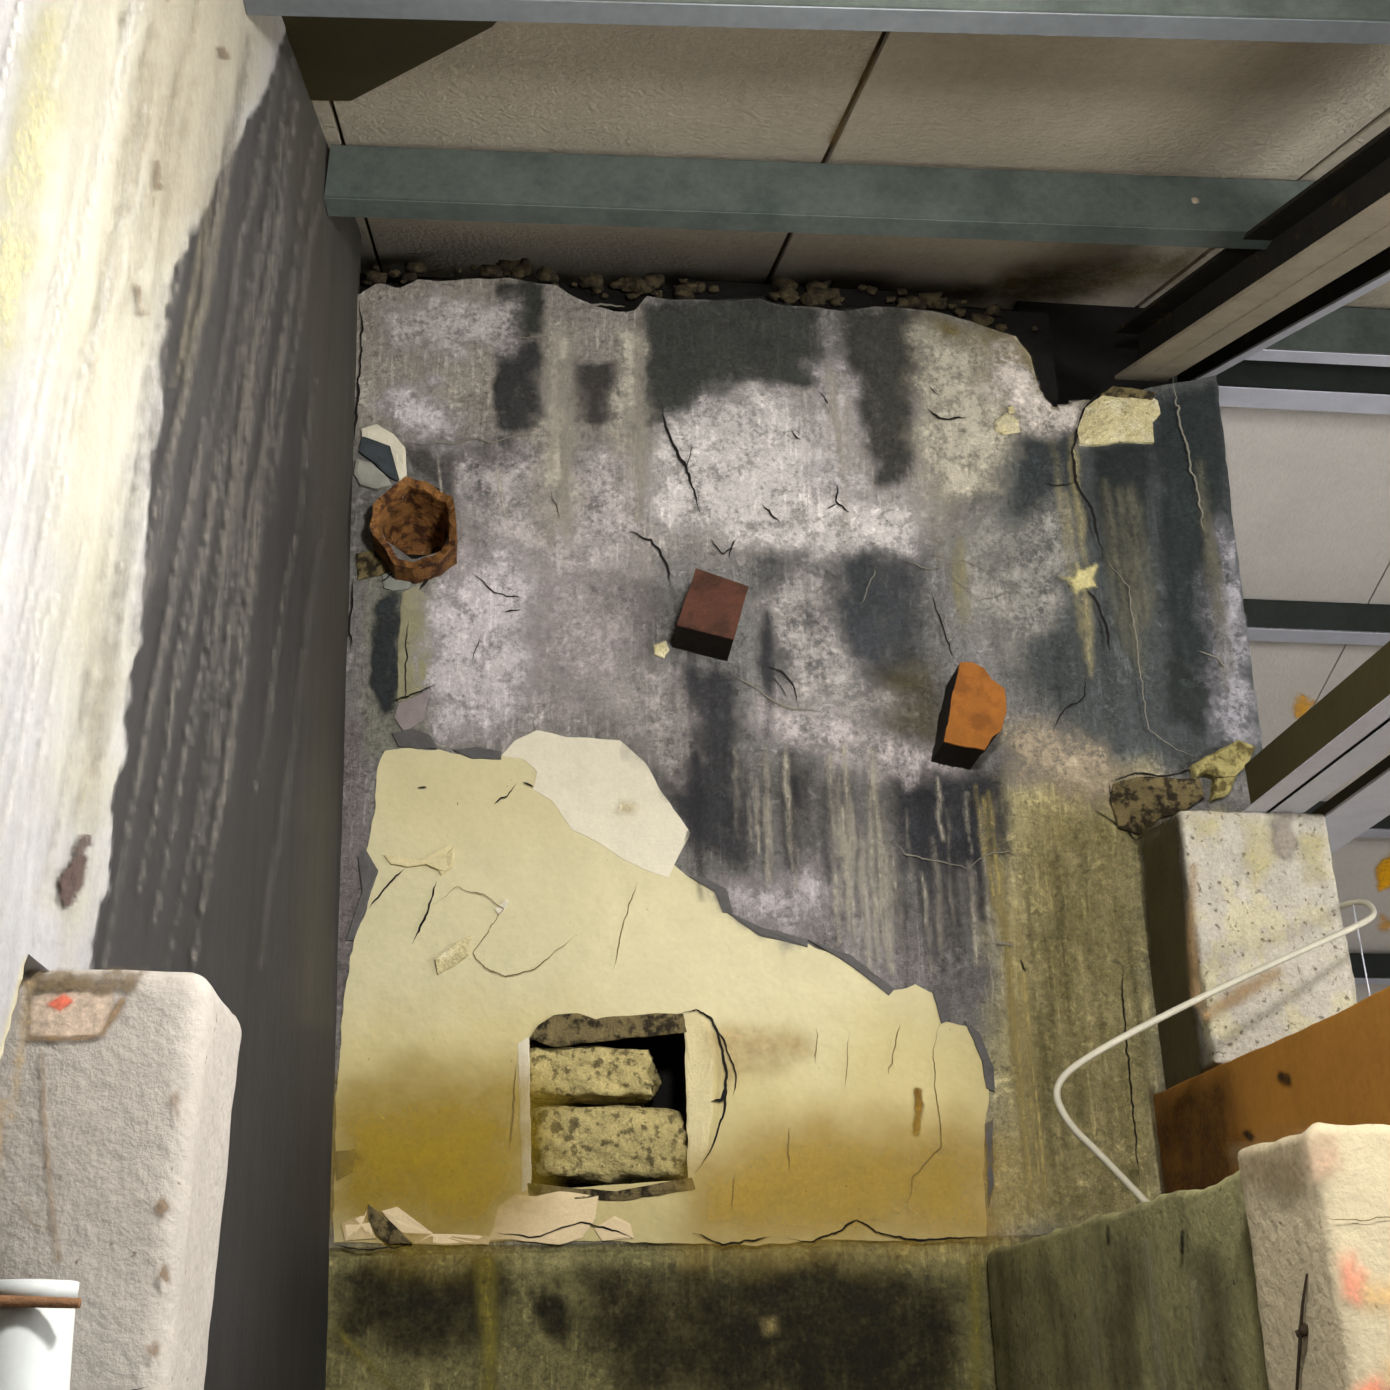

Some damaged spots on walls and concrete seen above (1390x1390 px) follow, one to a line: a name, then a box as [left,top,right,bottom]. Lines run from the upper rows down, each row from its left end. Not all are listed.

crack [661,402,736,556]
flaking render [1077,386,1160,447]
crack [1045,387,1196,844]
damp [1096,389,1259,743]
damp [369,282,1126,1200]
flaking render [333,550,995,1246]
damp [341,1256,512,1390]
damp [533,1294,572,1339]
crack [500,1221,632,1238]
crack [680,1009,737,1209]
damp [594,1259,980,1390]
crack [694,1025,978,1246]